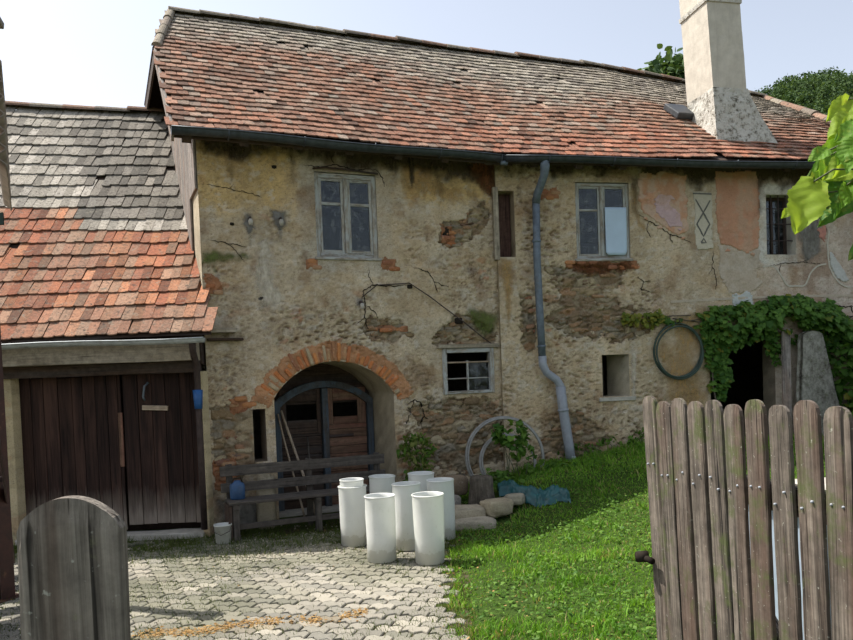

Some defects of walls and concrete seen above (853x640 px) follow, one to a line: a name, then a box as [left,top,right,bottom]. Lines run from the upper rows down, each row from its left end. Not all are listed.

flaking render [438,200,490,249]
crack [640,215,691,243]
flaking render [715,170,762,309]
crack [358,271,403,340]
flaking render [519,260,656,352]
flaking render [209,313,503,491]
flaking render [538,409,612,459]